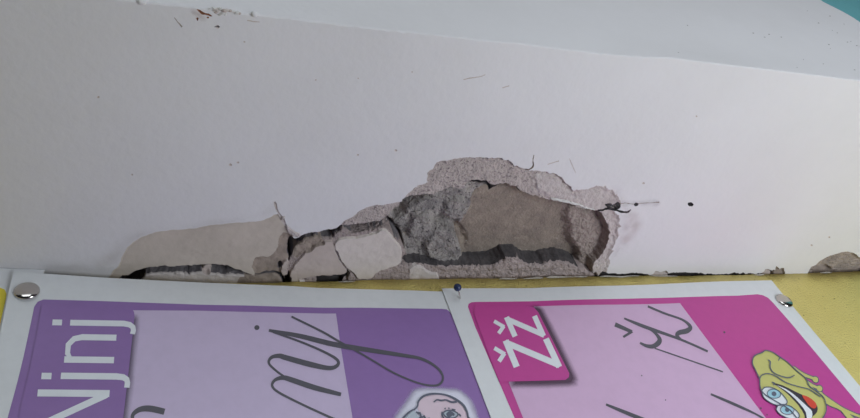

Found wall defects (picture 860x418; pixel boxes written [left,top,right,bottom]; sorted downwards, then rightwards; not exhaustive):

flaking render [108,214,300,283]
flaking render [371,157,629,289]
flaking render [808,252,860,273]